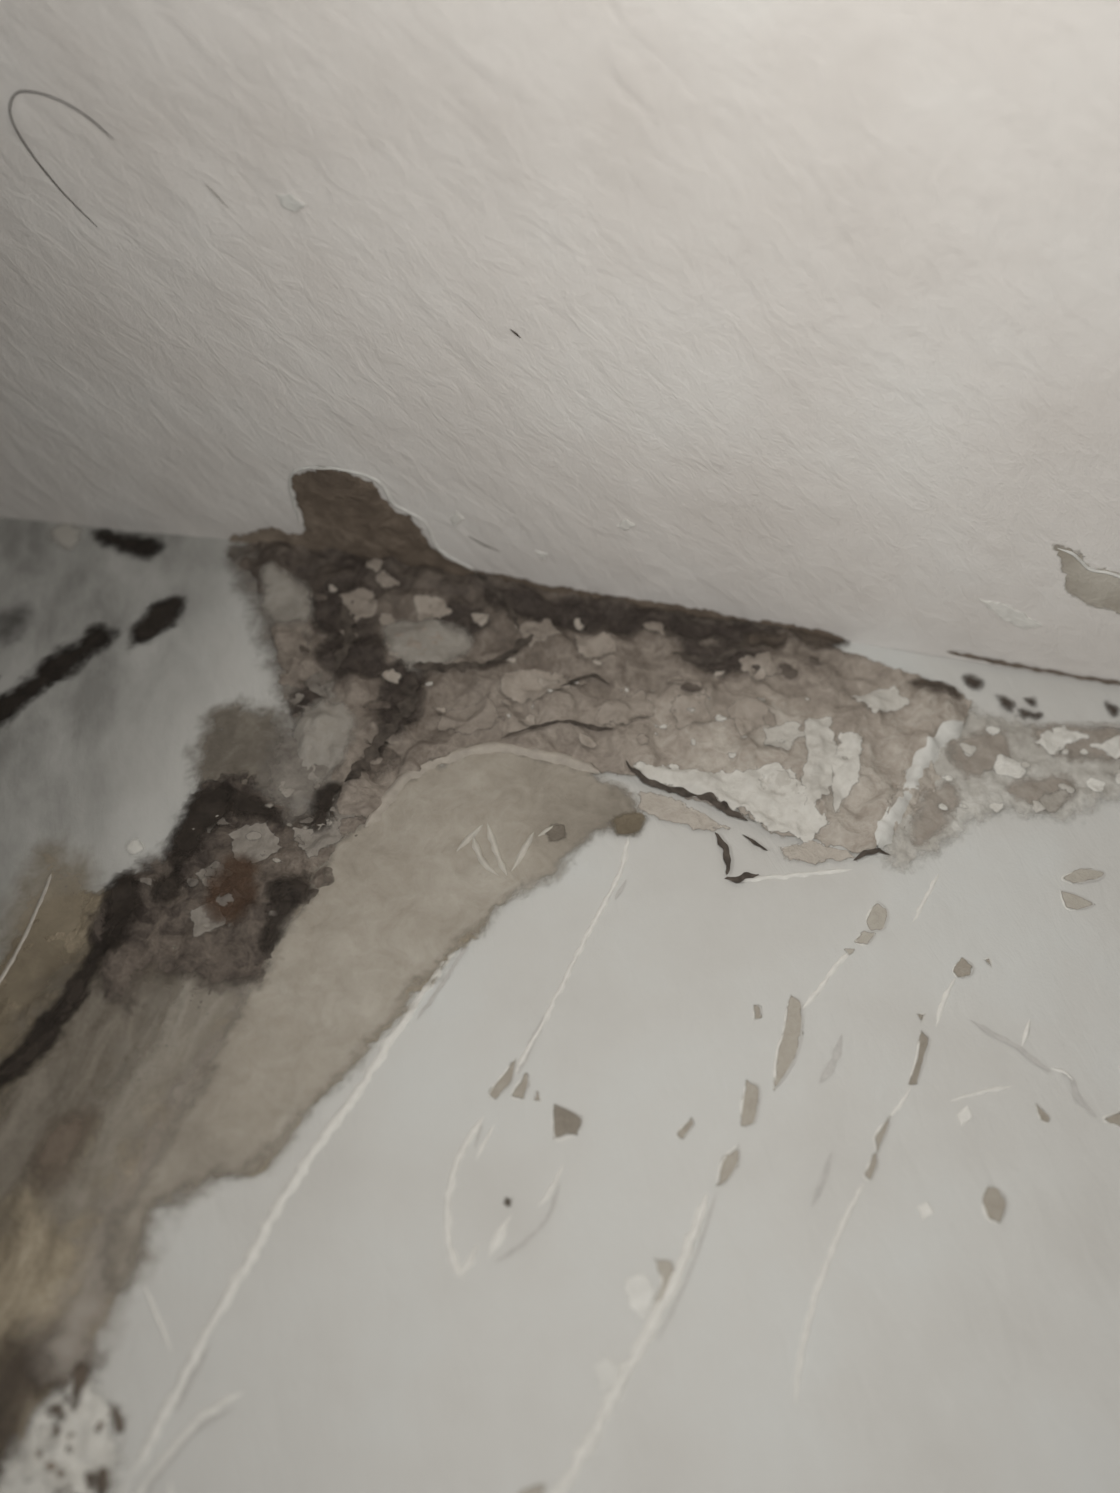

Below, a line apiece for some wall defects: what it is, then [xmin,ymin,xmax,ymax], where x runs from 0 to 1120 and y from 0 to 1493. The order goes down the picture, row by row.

leakage [93,529,163,558]
spalling [227,466,1120,883]
leakage [365,741,399,782]
peeling [1060,868,1106,911]
peeling [952,957,992,978]
leakage [0,547,367,1493]
leakage [188,903,504,1193]
peeling [488,1058,583,1142]
peeling [740,995,804,1126]
peeling [909,1013,930,1086]
peeling [982,1185,1008,1224]
peeling [0,1363,124,1493]